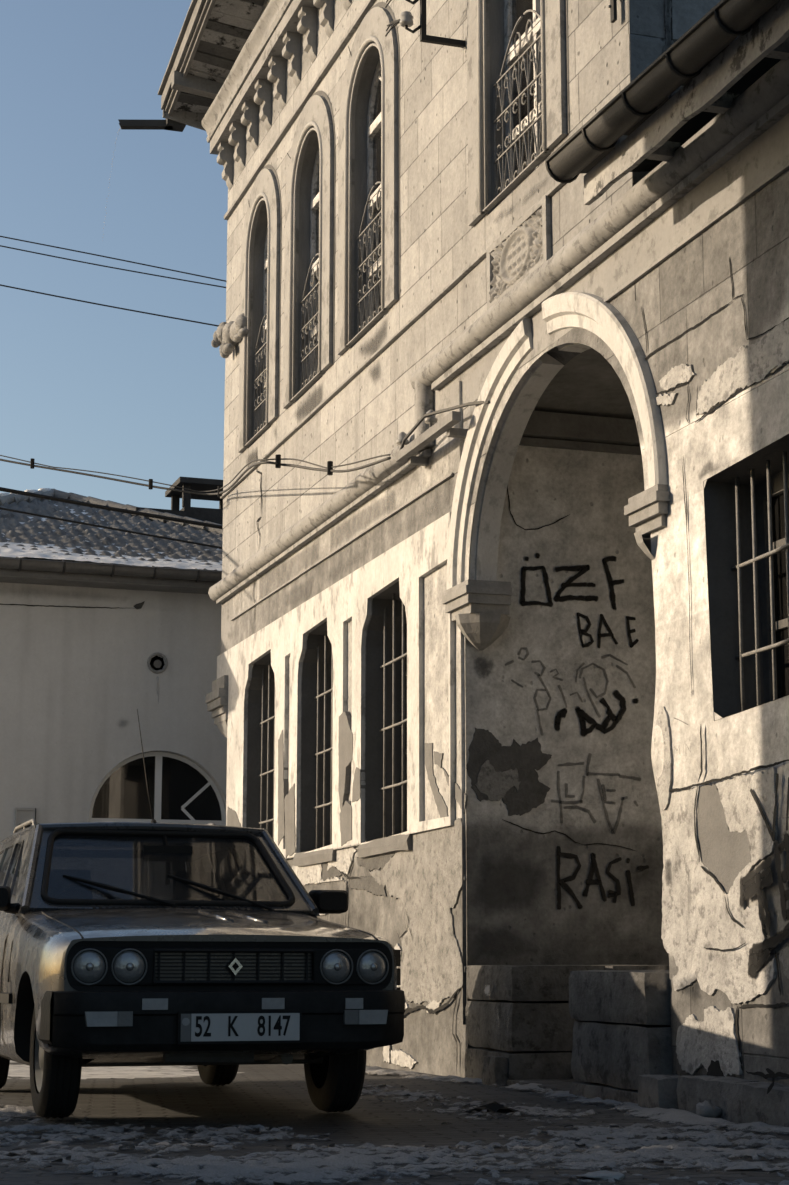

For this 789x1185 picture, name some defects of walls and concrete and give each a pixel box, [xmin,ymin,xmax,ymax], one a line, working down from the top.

crack [641,257,789,360]
peeling [655,321,789,415]
crack [655,362,789,423]
crack [683,455,692,693]
spalling [227,806,241,827]
peeling [278,711,552,1014]
peeling [661,767,789,1077]
peeling [383,1045,418,1069]